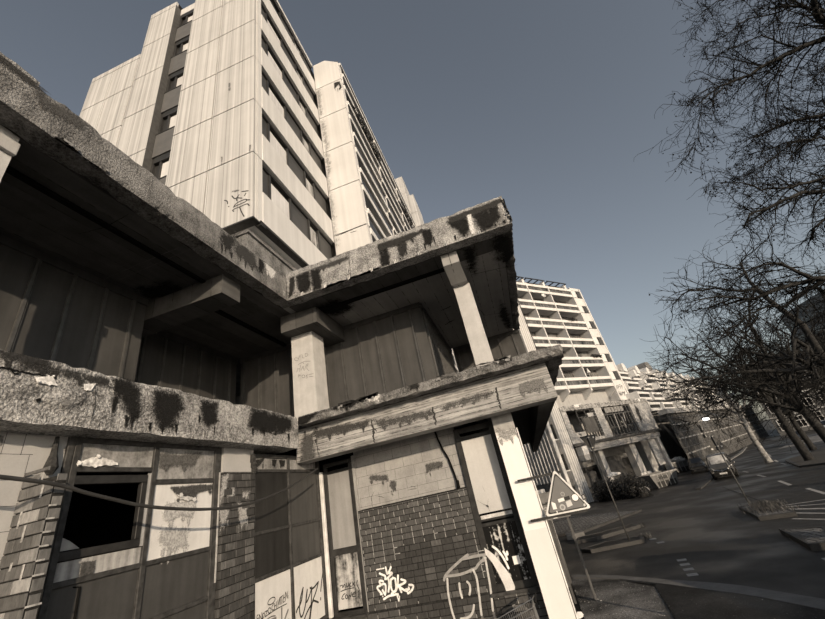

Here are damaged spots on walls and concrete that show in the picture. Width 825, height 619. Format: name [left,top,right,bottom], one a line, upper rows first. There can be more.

water stain [459,247,478,276]
water stain [454,214,514,268]